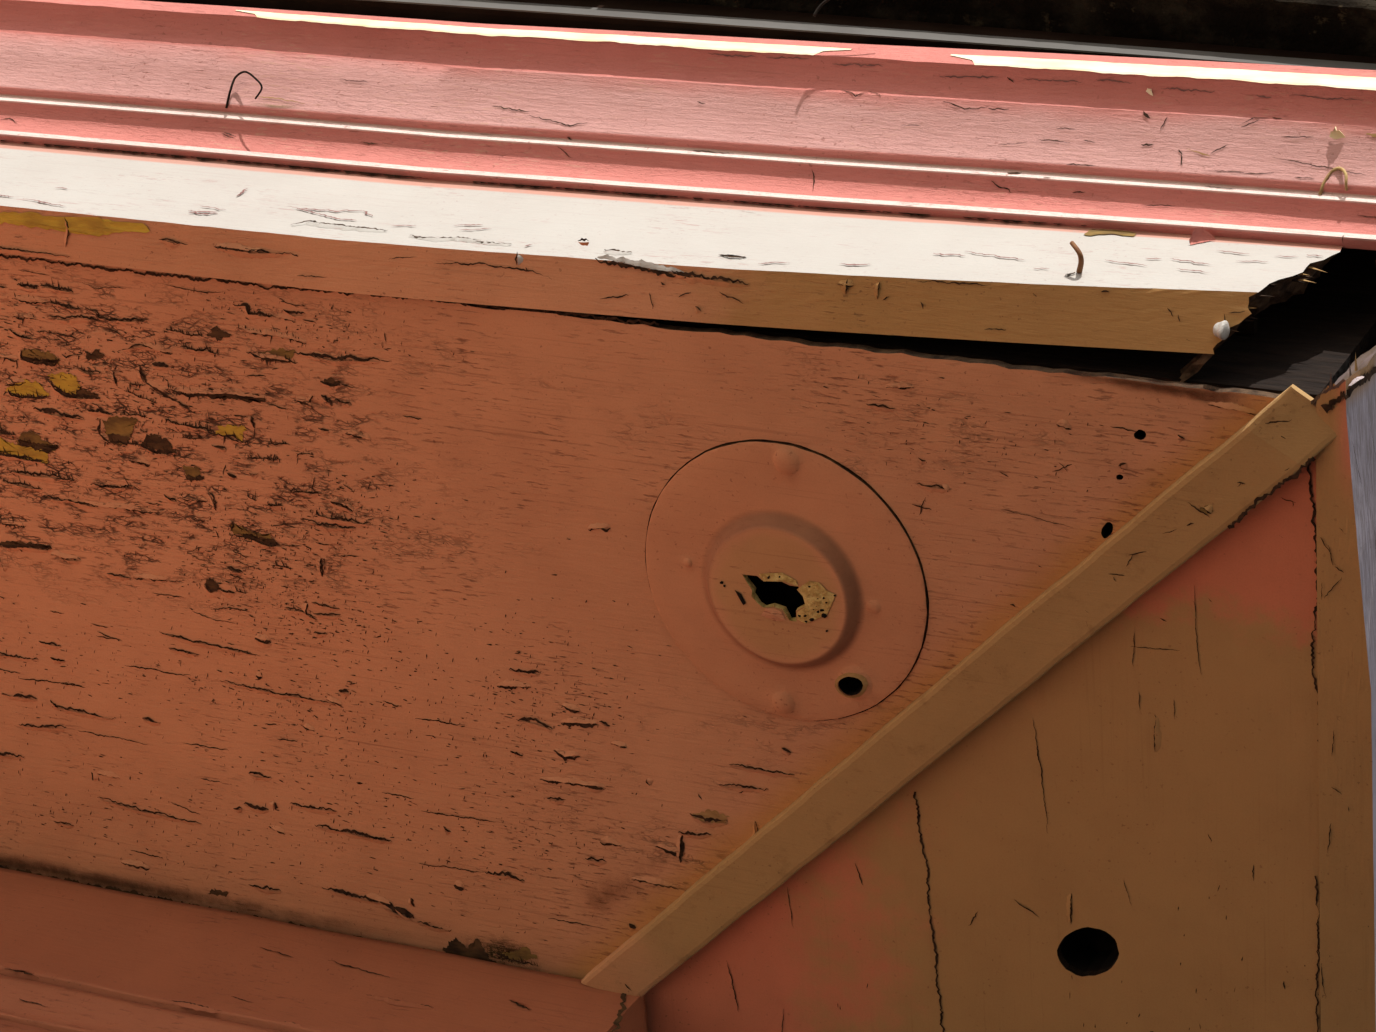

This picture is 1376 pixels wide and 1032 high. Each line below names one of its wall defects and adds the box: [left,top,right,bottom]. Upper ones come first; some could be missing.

crack [939,75,1009,110]
crack [473,106,929,216]
crack [919,139,1319,308]
peeling [1189,227,1216,245]
peeling [0,321,389,644]
crack [792,376,1136,527]
crack [0,118,795,959]
spalling [761,586,836,632]
peeling [0,752,25,760]
peeling [655,794,729,863]
peeling [442,937,566,977]
crack [913,792,945,1032]